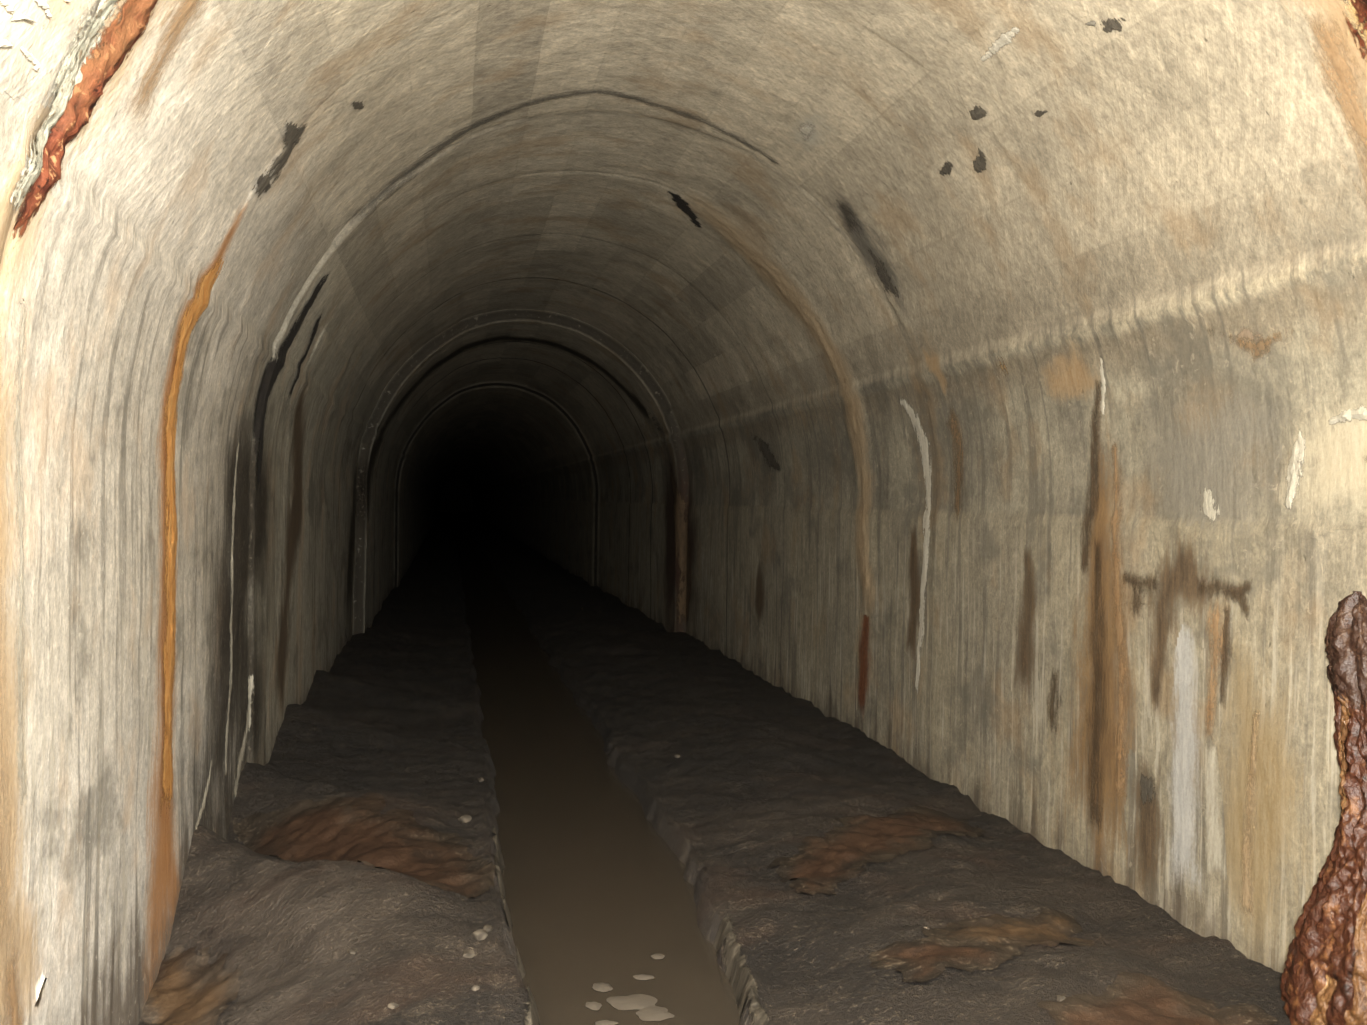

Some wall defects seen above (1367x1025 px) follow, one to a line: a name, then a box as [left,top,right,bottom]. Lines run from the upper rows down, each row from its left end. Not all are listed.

rust [1266,0,1367,168]
rust [0,0,202,1025]
rust [139,194,254,1025]
damp [1124,371,1327,905]